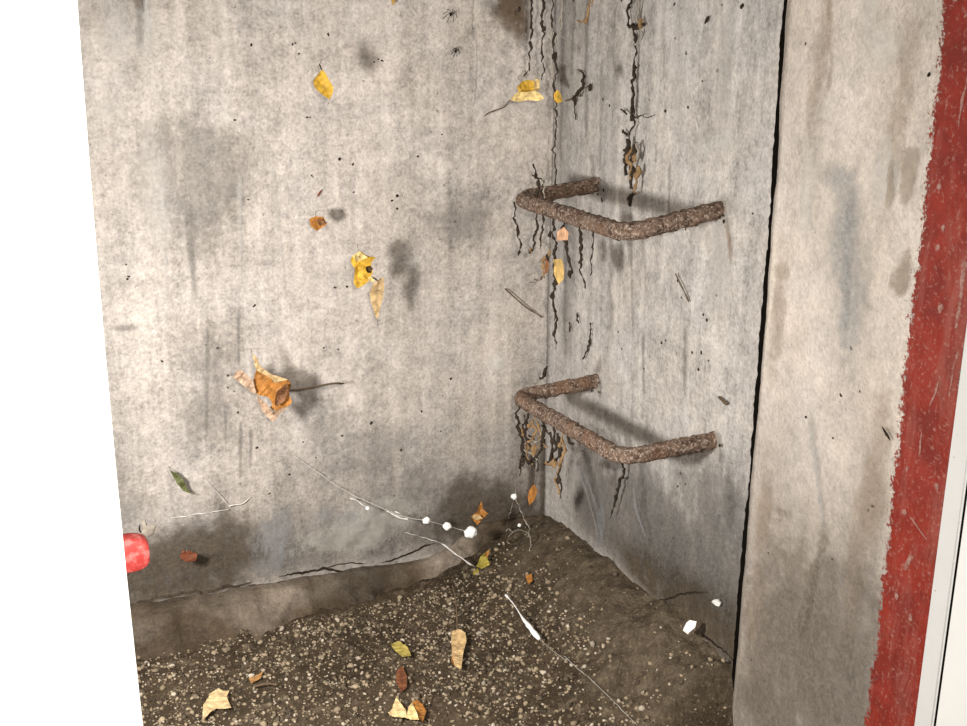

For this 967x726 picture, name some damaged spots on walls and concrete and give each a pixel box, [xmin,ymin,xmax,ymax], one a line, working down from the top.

corrosion [495,0,528,38]
crack [701,0,787,690]
water stain [442,446,545,540]
water stain [126,513,258,605]
crack [208,543,435,592]
crack [663,591,707,601]